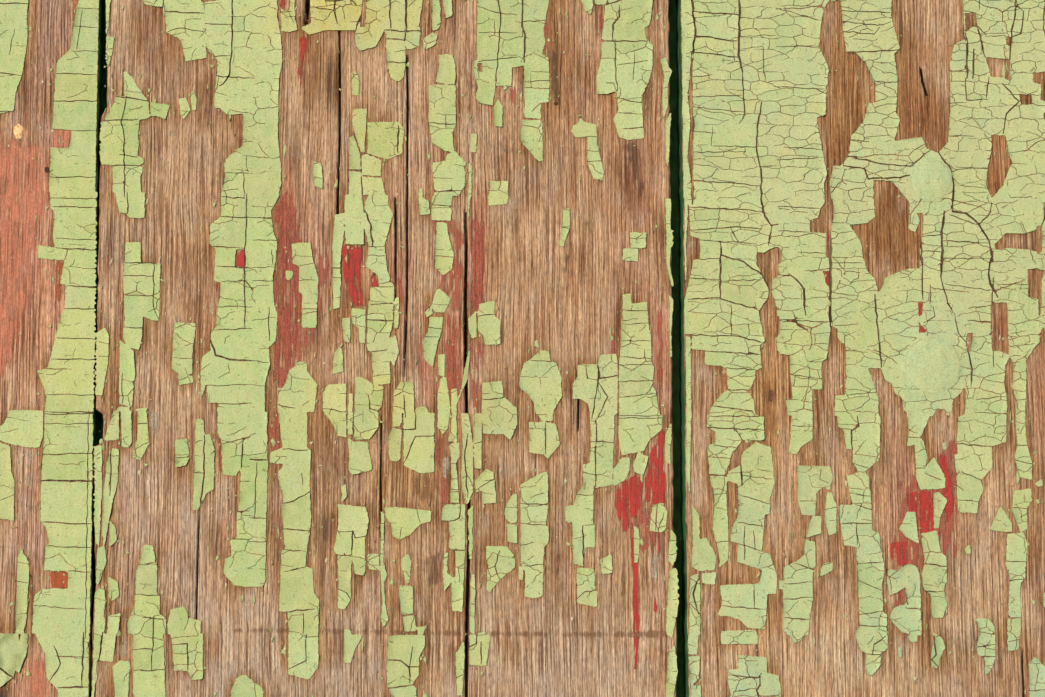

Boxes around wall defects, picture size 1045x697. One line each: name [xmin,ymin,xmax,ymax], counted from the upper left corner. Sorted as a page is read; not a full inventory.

peeling [0,0,204,697]
crack [335,30,343,209]
crack [395,60,408,377]
peeling [143,0,672,697]
crack [462,238,470,409]
peeling [580,0,1045,697]
crack [919,68,927,96]
crack [464,477,472,697]